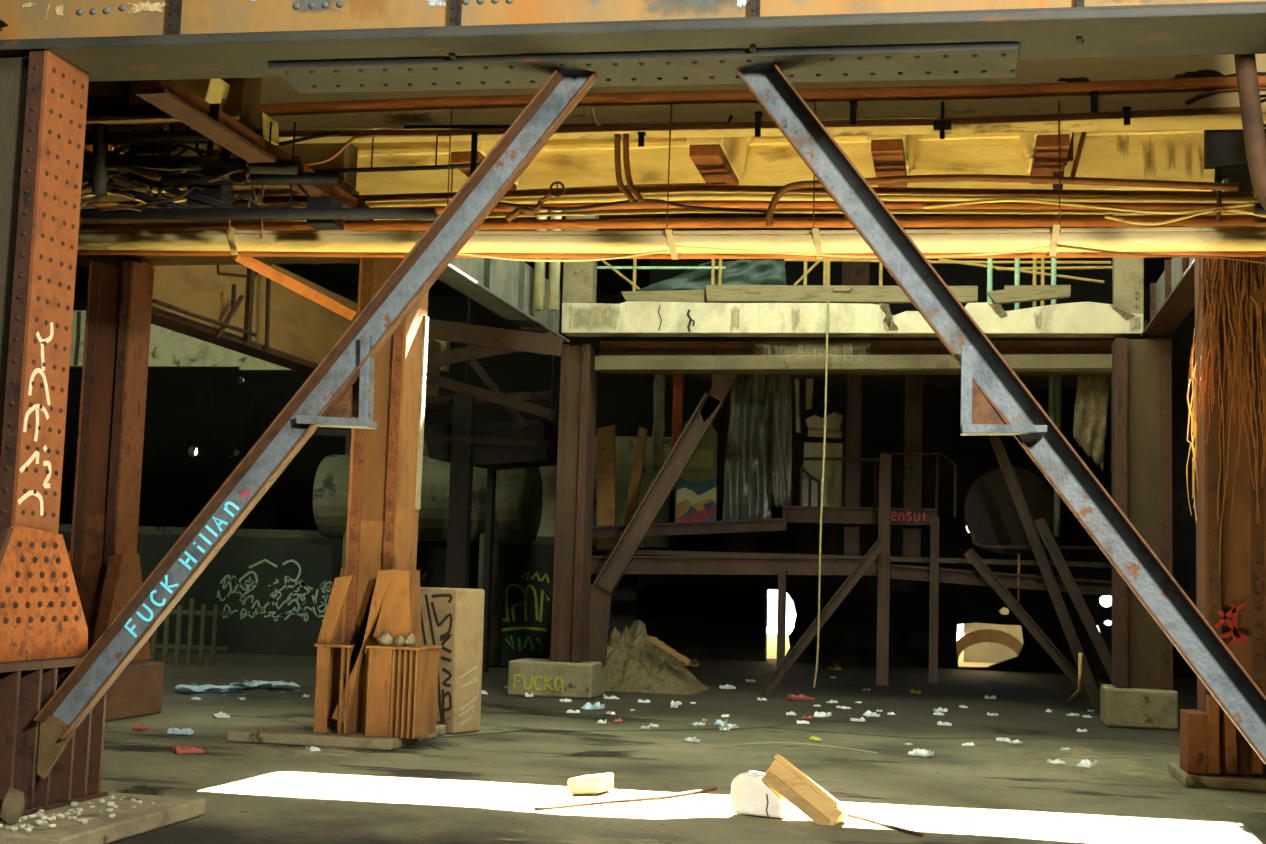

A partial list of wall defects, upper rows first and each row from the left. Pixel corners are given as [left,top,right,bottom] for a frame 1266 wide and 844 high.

peeling [127,1,170,14]